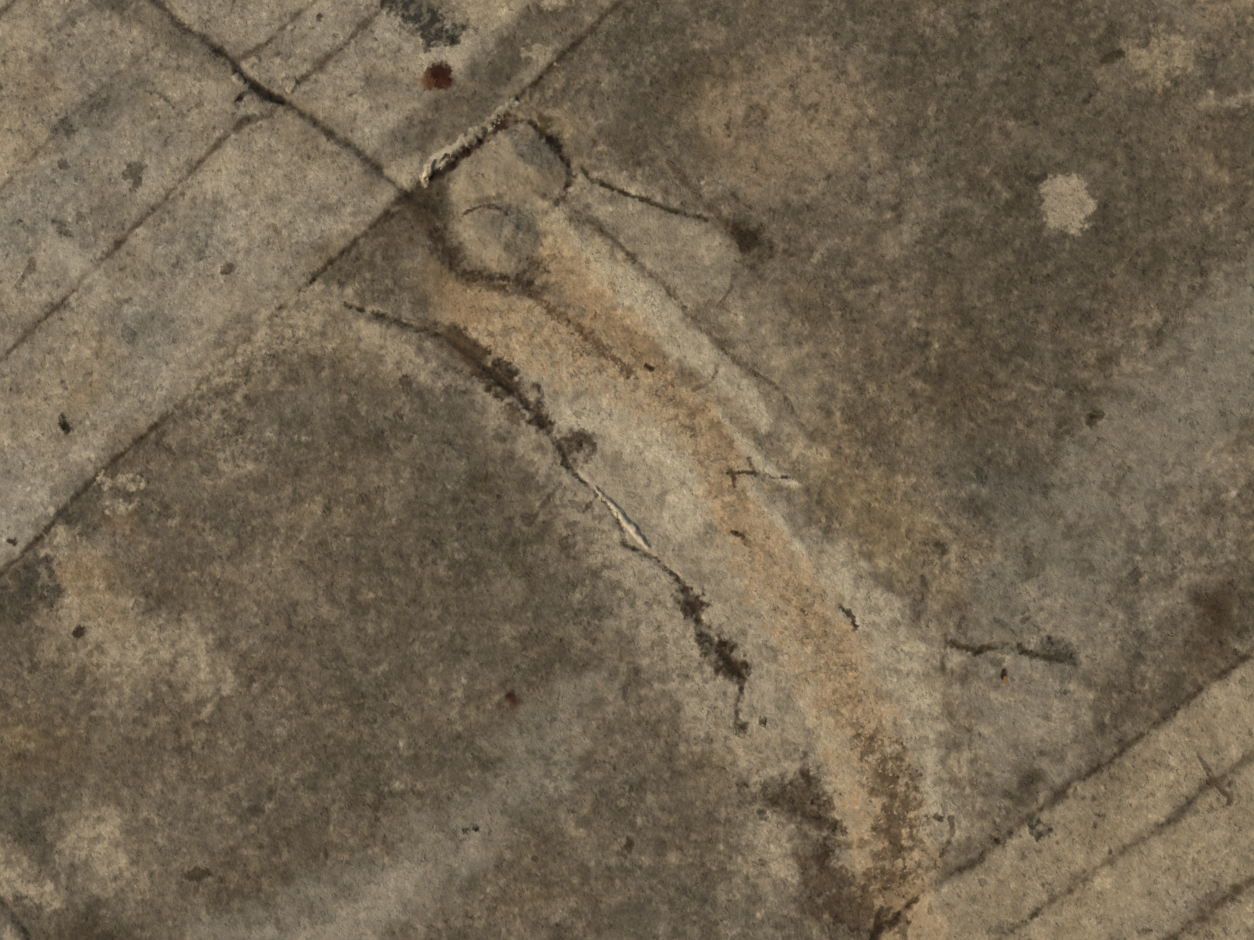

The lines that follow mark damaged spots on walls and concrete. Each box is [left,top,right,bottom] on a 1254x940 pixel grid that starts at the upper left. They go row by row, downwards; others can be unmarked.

corrosion [409,57,457,95]
crack [418,111,817,443]
crack [343,301,753,730]
crack [725,455,791,489]